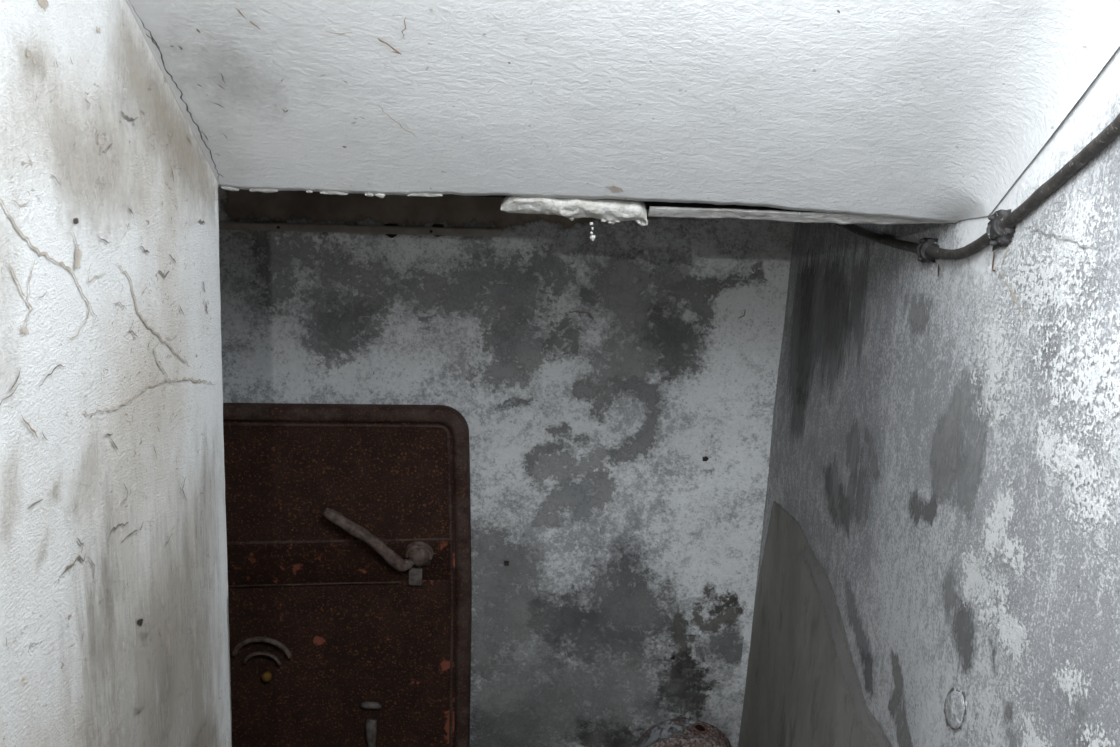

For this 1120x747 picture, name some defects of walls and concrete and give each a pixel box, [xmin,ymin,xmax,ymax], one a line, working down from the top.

crack [133,7,223,181]
flaking render [501,186,949,226]
crack [0,198,215,449]
leakage [582,248,711,397]
leakage [788,245,869,437]
leakage [823,421,880,537]
leakage [909,370,988,525]
leakage [470,518,747,747]